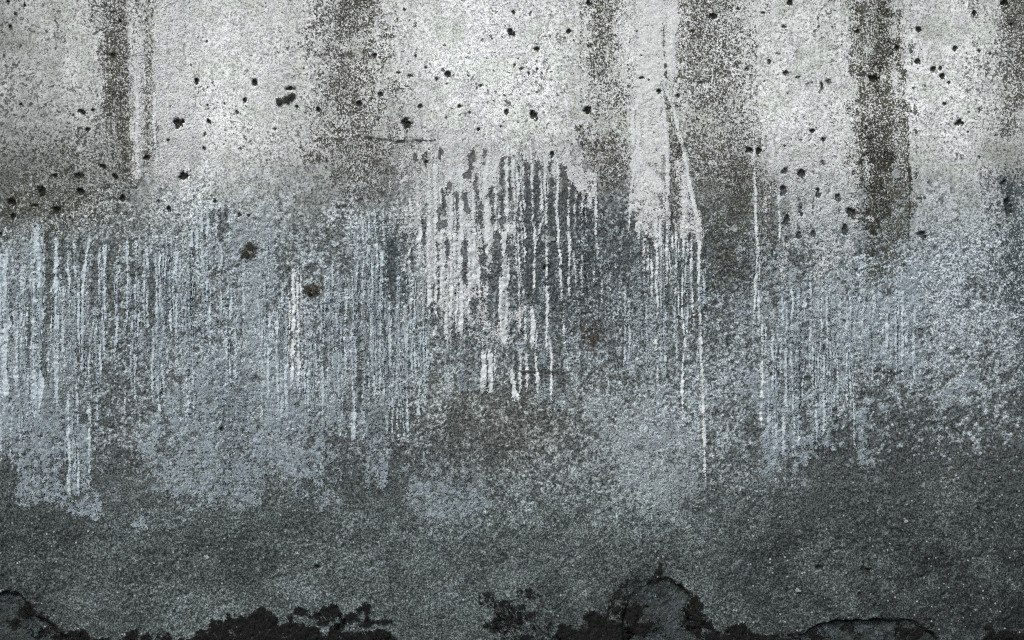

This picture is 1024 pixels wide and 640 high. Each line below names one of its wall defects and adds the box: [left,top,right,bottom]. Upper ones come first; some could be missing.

damp [0,0,923,497]
spalling [0,591,109,640]
peeling [286,601,395,640]
peeling [475,587,541,633]
spalling [556,577,713,640]